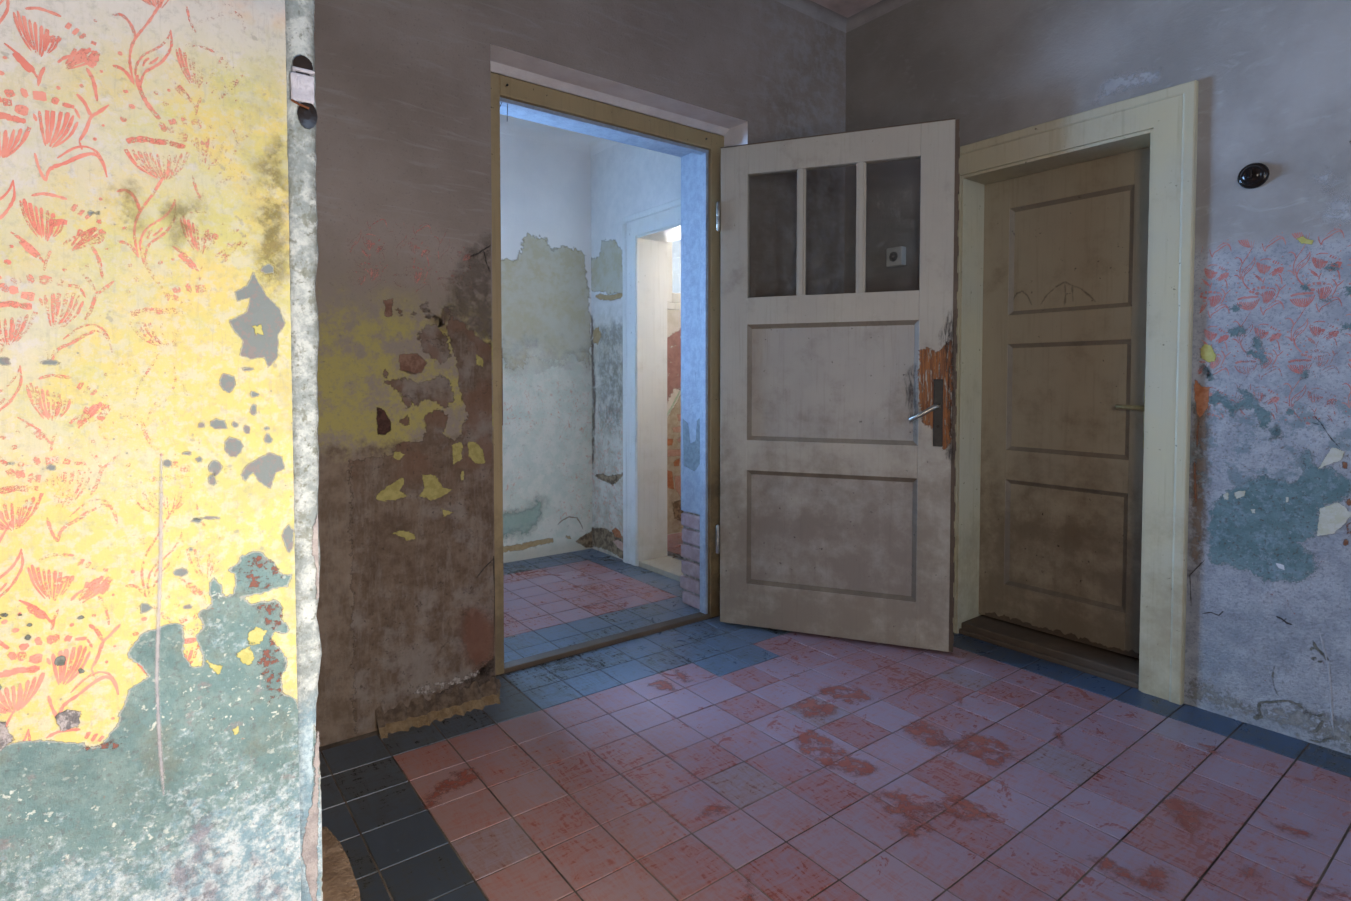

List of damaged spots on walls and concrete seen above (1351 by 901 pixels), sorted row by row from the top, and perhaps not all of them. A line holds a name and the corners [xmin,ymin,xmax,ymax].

peeling [219,264,286,393]
peeling [1227,304,1268,365]
peeling [1300,261,1351,302]
peeling [163,391,285,489]
peeling [282,525,294,553]
peeling [347,233,623,734]
peeling [1193,365,1351,584]
peeling [0,551,323,901]